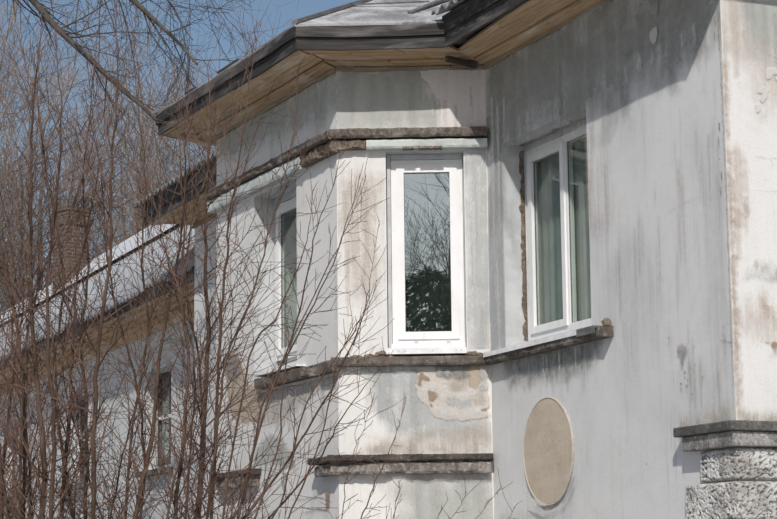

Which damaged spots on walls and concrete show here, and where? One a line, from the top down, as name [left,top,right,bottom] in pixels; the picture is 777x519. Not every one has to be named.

water stain [746,0,777,51]
water stain [220,71,437,153]
water stain [465,0,714,351]
spalling [519,117,586,340]
spalling [415,366,490,421]
water stain [507,341,597,381]